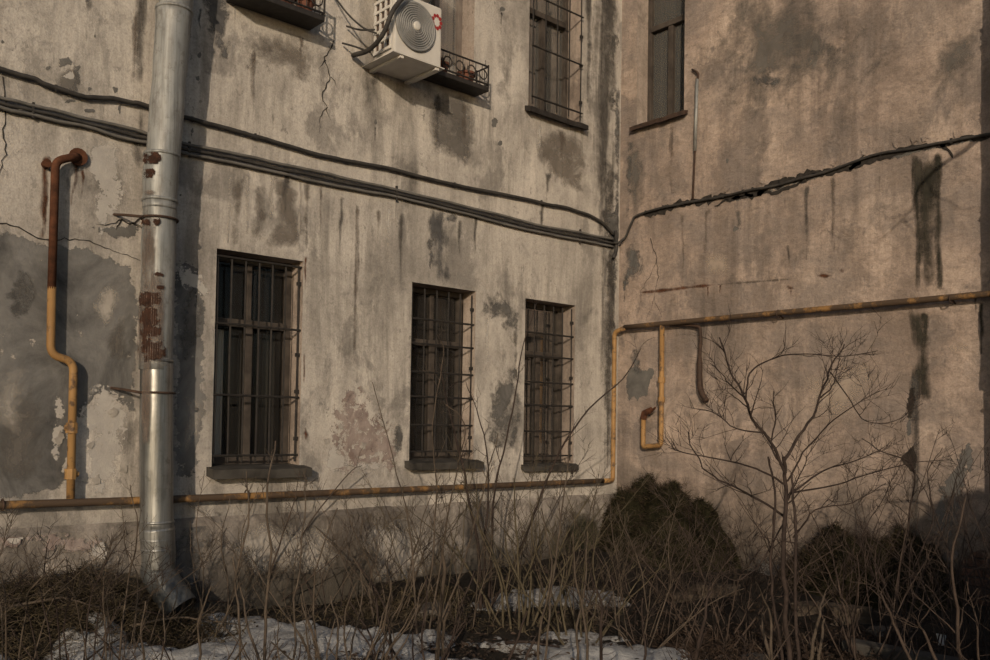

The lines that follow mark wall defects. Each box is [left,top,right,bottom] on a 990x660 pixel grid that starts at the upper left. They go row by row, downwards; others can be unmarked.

crack [0,76,8,171]
crack [319,40,337,132]
crack [0,218,140,261]
crack [638,135,990,317]
water stain [912,155,942,287]
spalling [626,350,654,401]
peeling [51,396,65,460]
peeling [84,384,128,494]
peeling [323,387,403,475]
water stain [911,314,929,537]